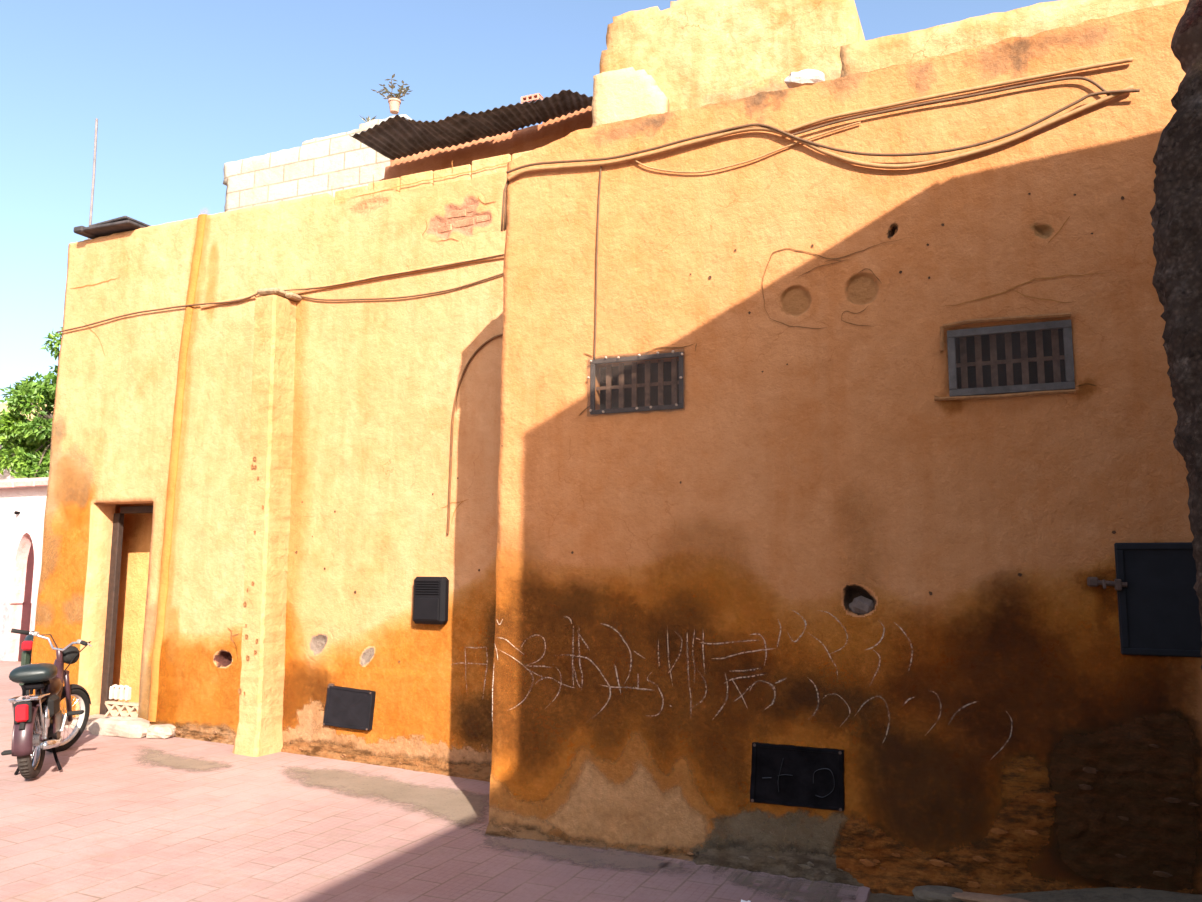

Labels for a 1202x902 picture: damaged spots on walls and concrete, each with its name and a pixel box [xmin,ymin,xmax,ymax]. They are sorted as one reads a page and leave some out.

flaking render [421,190,498,247]
damp [31,479,88,718]
flaking render [281,738,492,782]
damp [282,577,1167,854]
flaking render [485,710,1202,902]